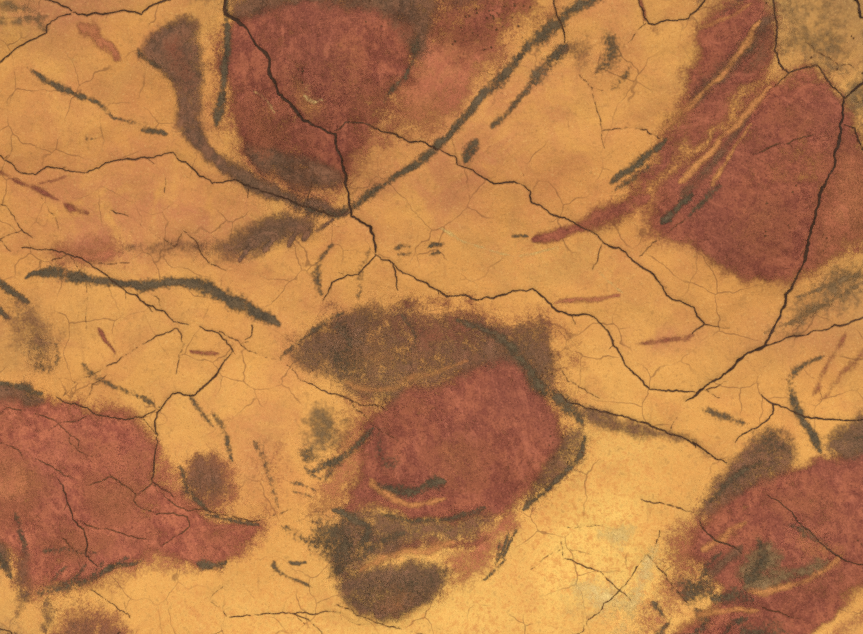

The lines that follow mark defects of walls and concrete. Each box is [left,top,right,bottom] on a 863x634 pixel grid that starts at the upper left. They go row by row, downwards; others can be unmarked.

crack [0,0,863,463]
crack [0,204,398,567]
crack [212,586,422,634]
crack [531,525,688,634]
crack [641,499,741,553]
crack [768,495,863,565]